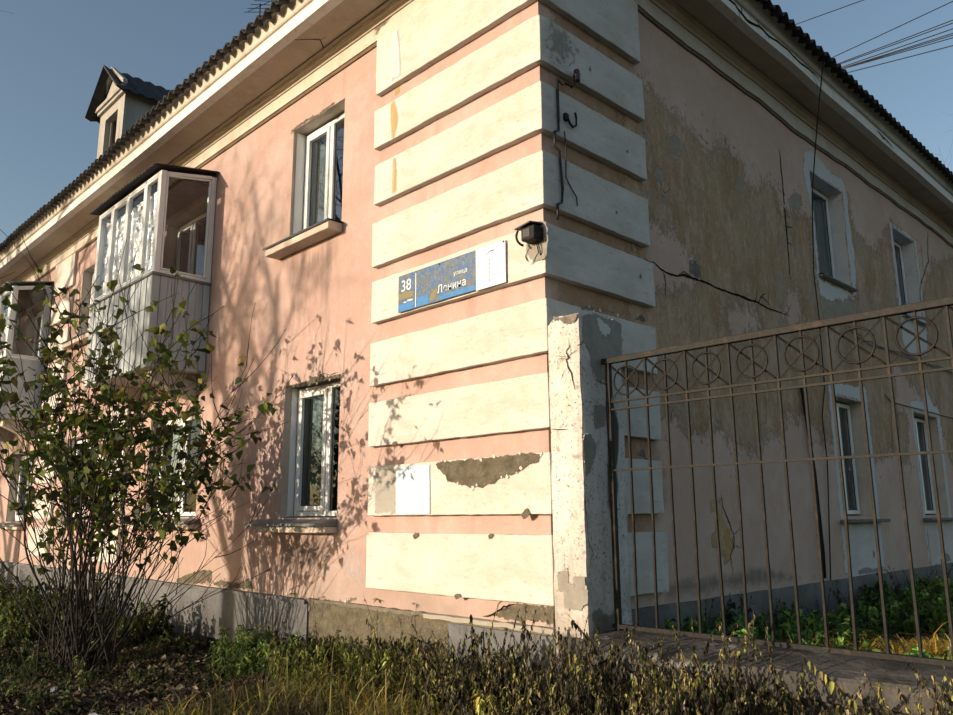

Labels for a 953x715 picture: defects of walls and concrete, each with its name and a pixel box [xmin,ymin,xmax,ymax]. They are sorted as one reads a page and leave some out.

crack [779,150,793,281]
crack [645,259,791,316]
peeling [553,75,953,476]
crack [557,341,584,385]
spalling [436,452,543,491]
peeling [498,568,588,625]